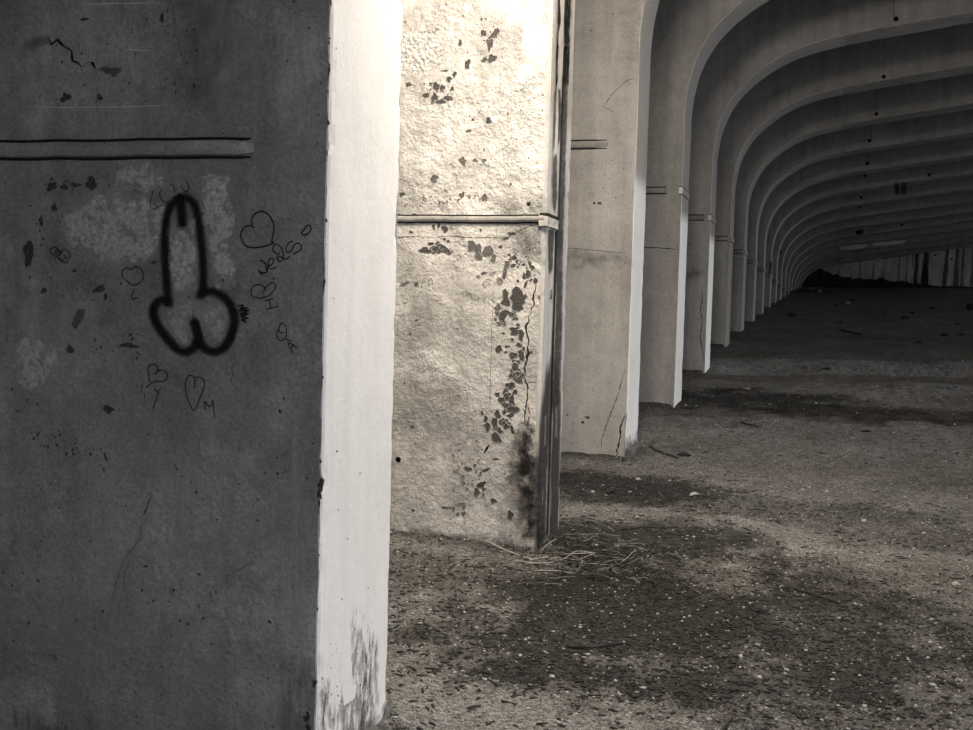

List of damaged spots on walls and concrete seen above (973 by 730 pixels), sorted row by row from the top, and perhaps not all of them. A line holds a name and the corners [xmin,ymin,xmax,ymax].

crack [47,37,122,76]
flaking render [401,18,502,107]
spalling [399,276,460,289]
peeling [432,84,568,517]
water stain [510,231,561,551]
crack [601,371,625,456]
water stain [322,632,377,730]